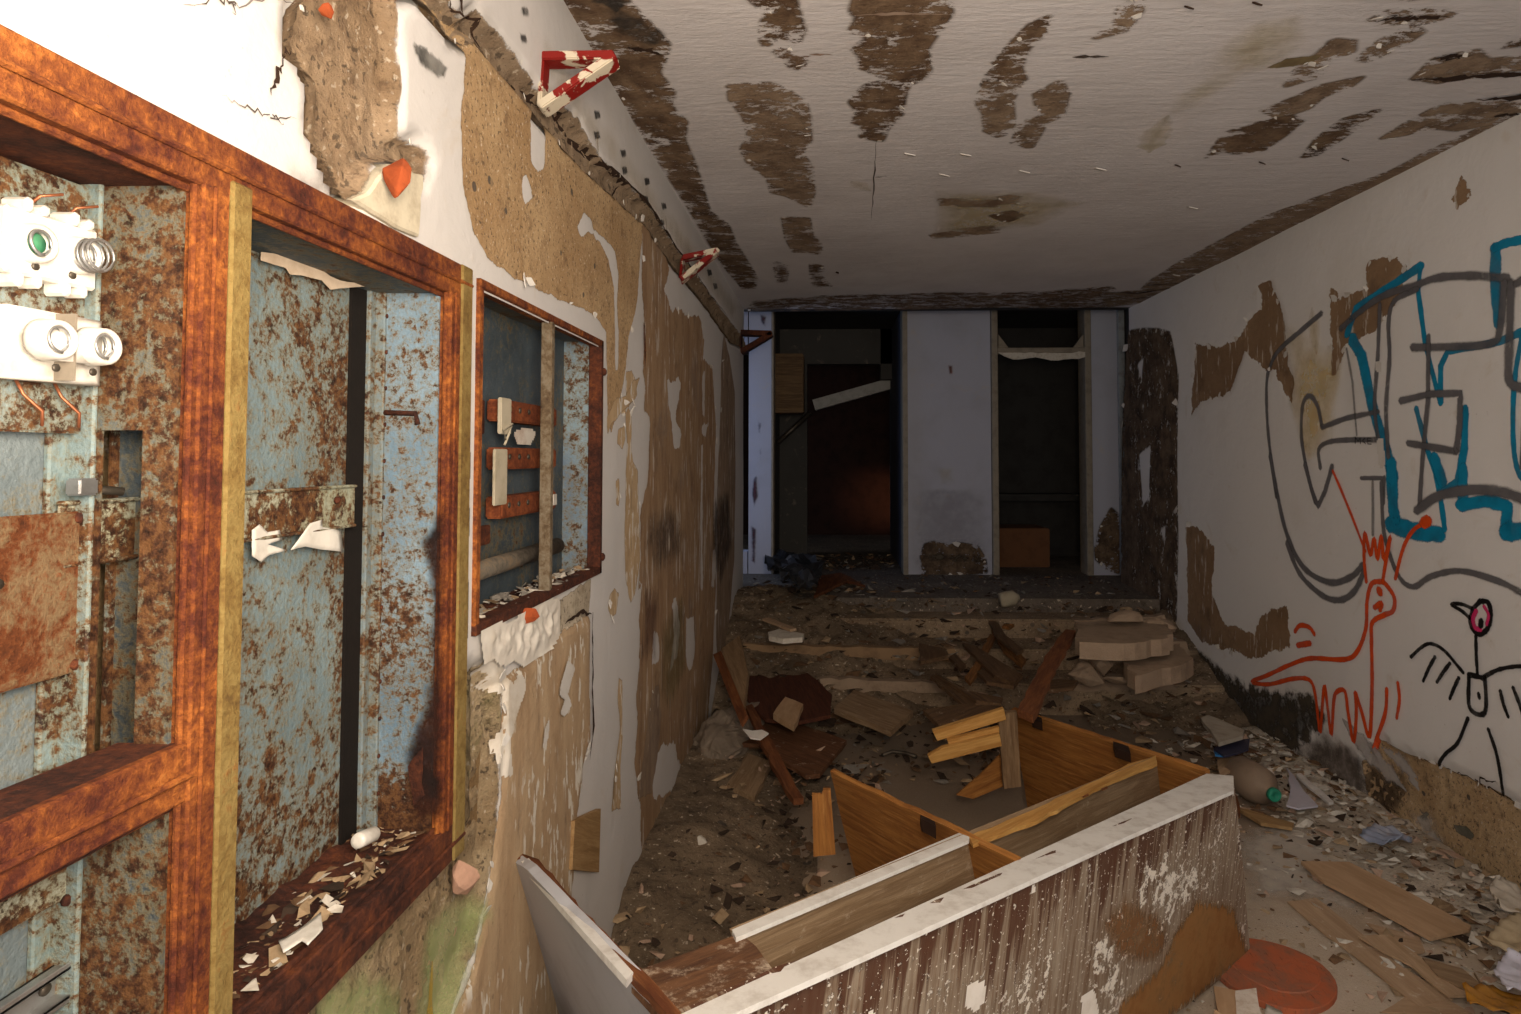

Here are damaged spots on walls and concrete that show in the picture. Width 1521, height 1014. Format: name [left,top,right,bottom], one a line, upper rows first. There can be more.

crack [183,0,294,15]
crack [223,47,294,125]
peeling [282,0,1521,850]
corrosion [408,519,442,816]
peeling [308,579,591,1014]
spalling [1362,740,1521,890]